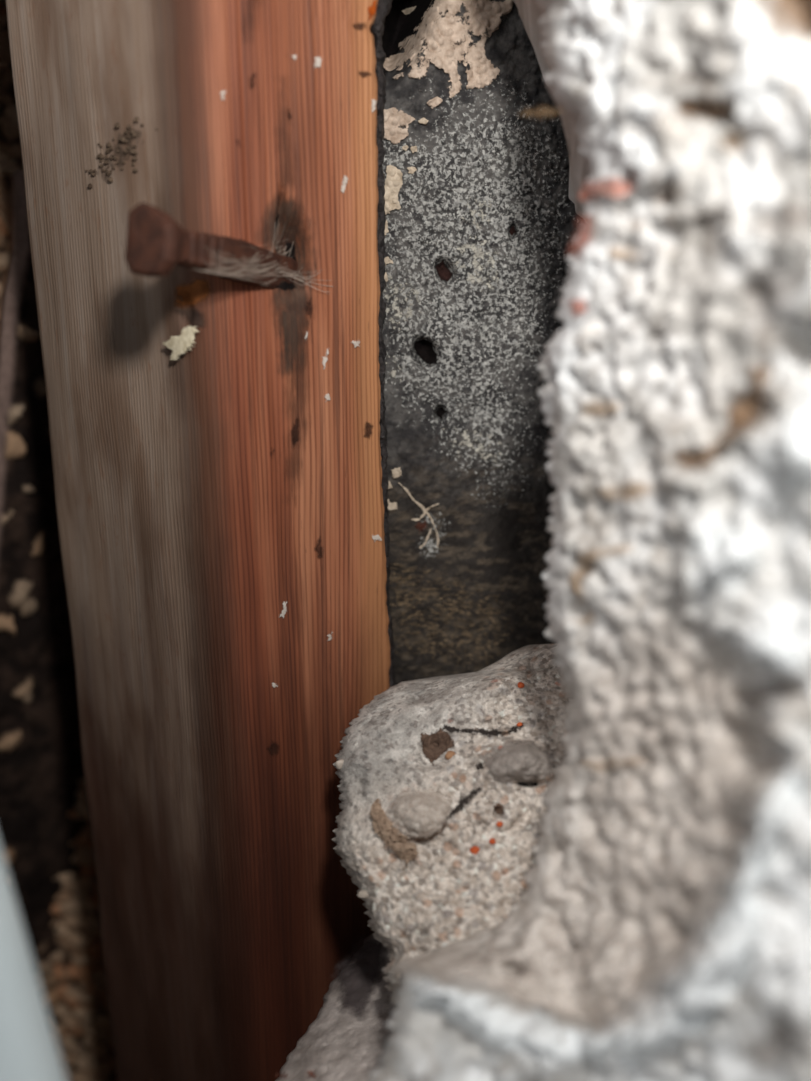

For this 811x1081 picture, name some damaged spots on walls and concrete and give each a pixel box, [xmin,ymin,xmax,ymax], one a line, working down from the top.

flaking render [383,0,514,153]
peeling [384,165,417,235]
peeling [388,467,402,510]
crack [442,723,524,738]
crack [408,763,504,842]